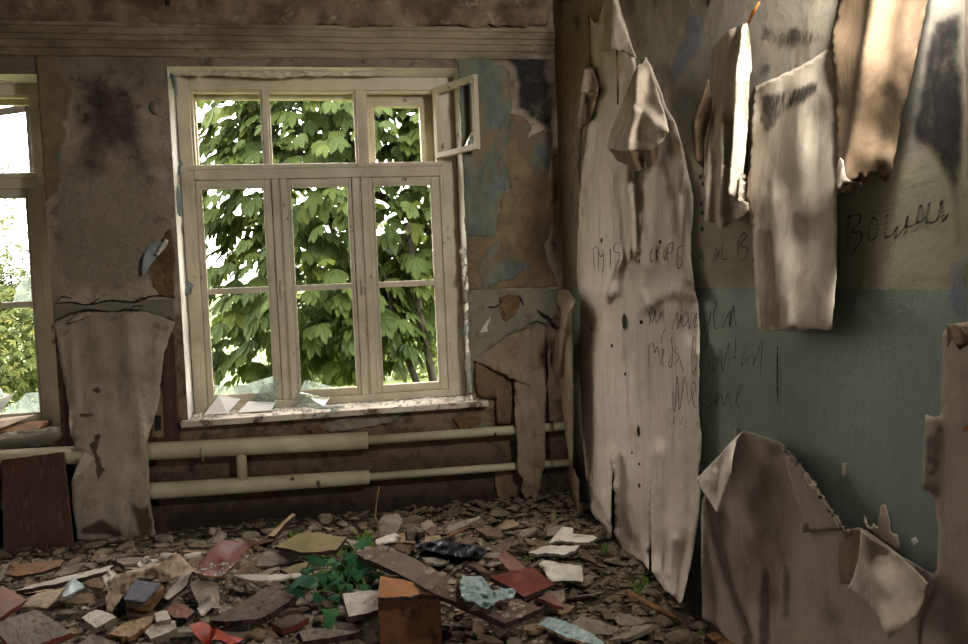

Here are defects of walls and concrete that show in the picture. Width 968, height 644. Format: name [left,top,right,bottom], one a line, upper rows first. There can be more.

peeling [455,59,558,396]
flaking render [452,415,493,429]